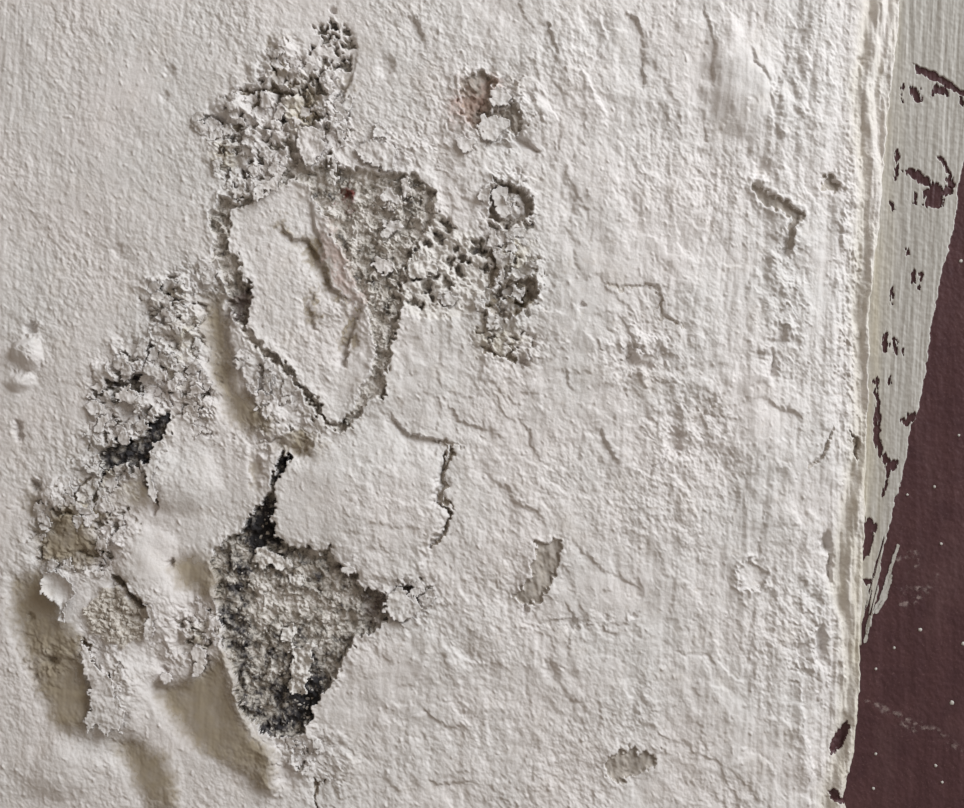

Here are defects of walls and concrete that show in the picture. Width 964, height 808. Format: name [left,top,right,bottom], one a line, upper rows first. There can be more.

spalling [900,64,964,107]
spalling [894,149,956,209]
spalling [911,269,924,290]
spalling [882,332,904,356]
spalling [26,20,551,776]
spalling [872,375,899,497]
spalling [900,411,916,427]
crack [424,436,465,549]
spalling [862,517,877,561]
peeling [512,538,563,606]
spalling [829,720,851,755]
peeling [605,744,662,785]